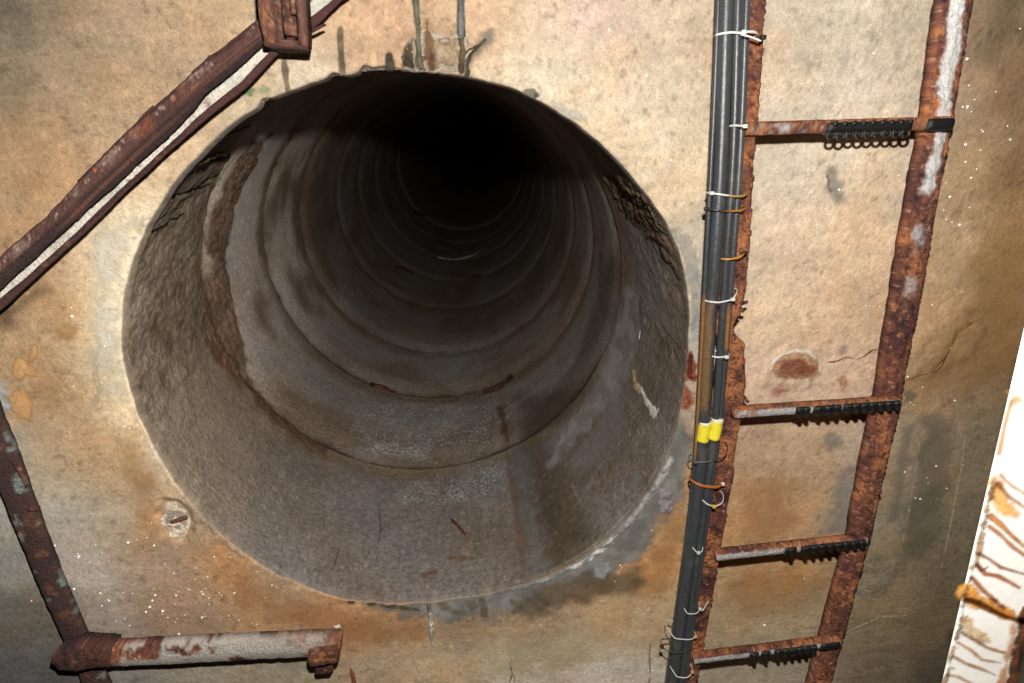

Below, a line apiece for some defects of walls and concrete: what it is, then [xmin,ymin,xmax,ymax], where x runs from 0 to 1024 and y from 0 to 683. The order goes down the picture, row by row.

spalling [600,174,679,277]
peeling [9,345,37,421]
water stain [548,283,659,467]
rust [681,351,697,409]
crack [910,319,980,380]
rust [998,397,1019,454]
spalling [160,501,191,538]
water stain [368,427,692,647]
rust [942,475,1024,683]